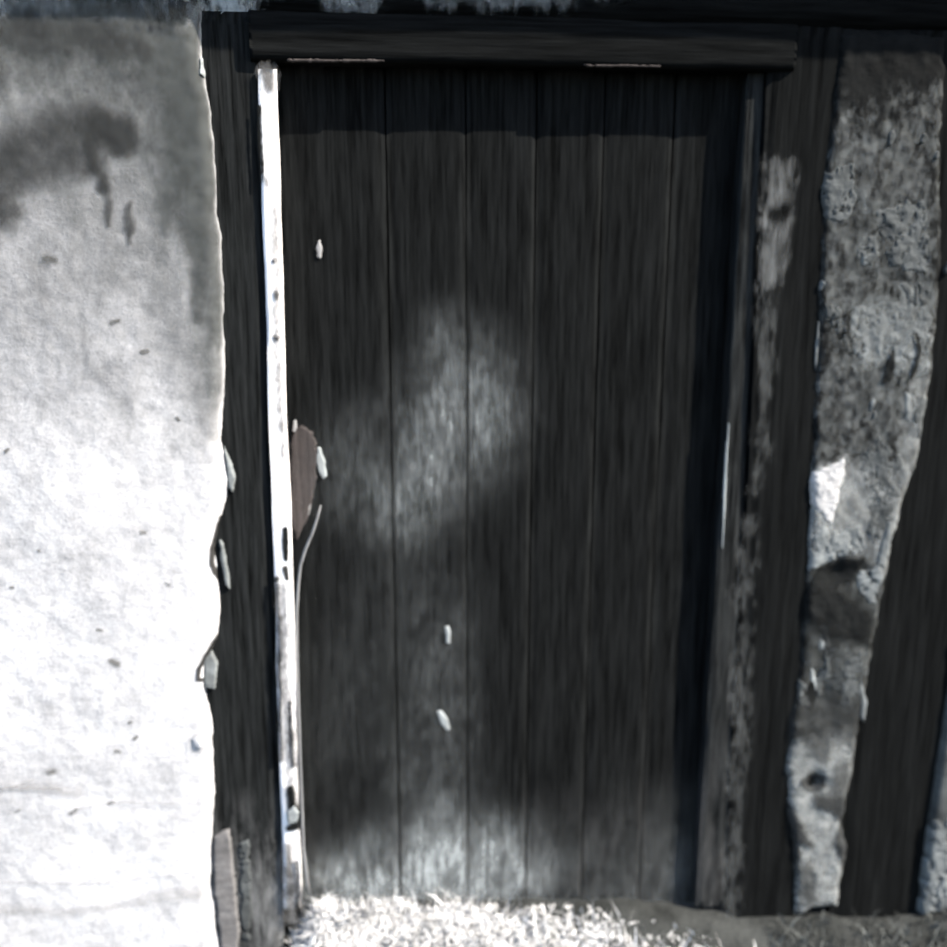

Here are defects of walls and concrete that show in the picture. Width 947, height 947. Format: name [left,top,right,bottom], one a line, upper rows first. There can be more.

leakage [0,0,222,409]
peeling [98,0,255,22]
peeling [807,107,939,633]
peeling [786,620,872,913]